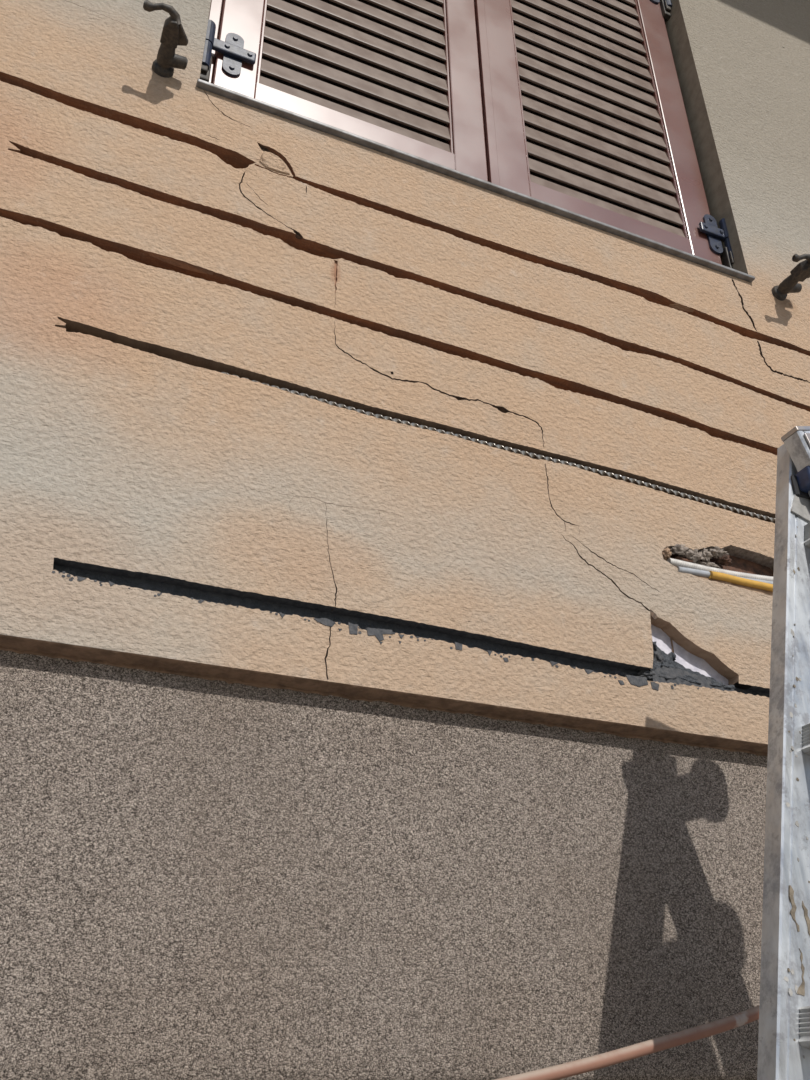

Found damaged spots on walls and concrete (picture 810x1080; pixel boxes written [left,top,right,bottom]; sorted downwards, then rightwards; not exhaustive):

crack [239,172,303,240]
crack [732,279,810,383]
crack [334,260,659,611]
crack [274,491,401,680]
flaking render [637,609,739,693]